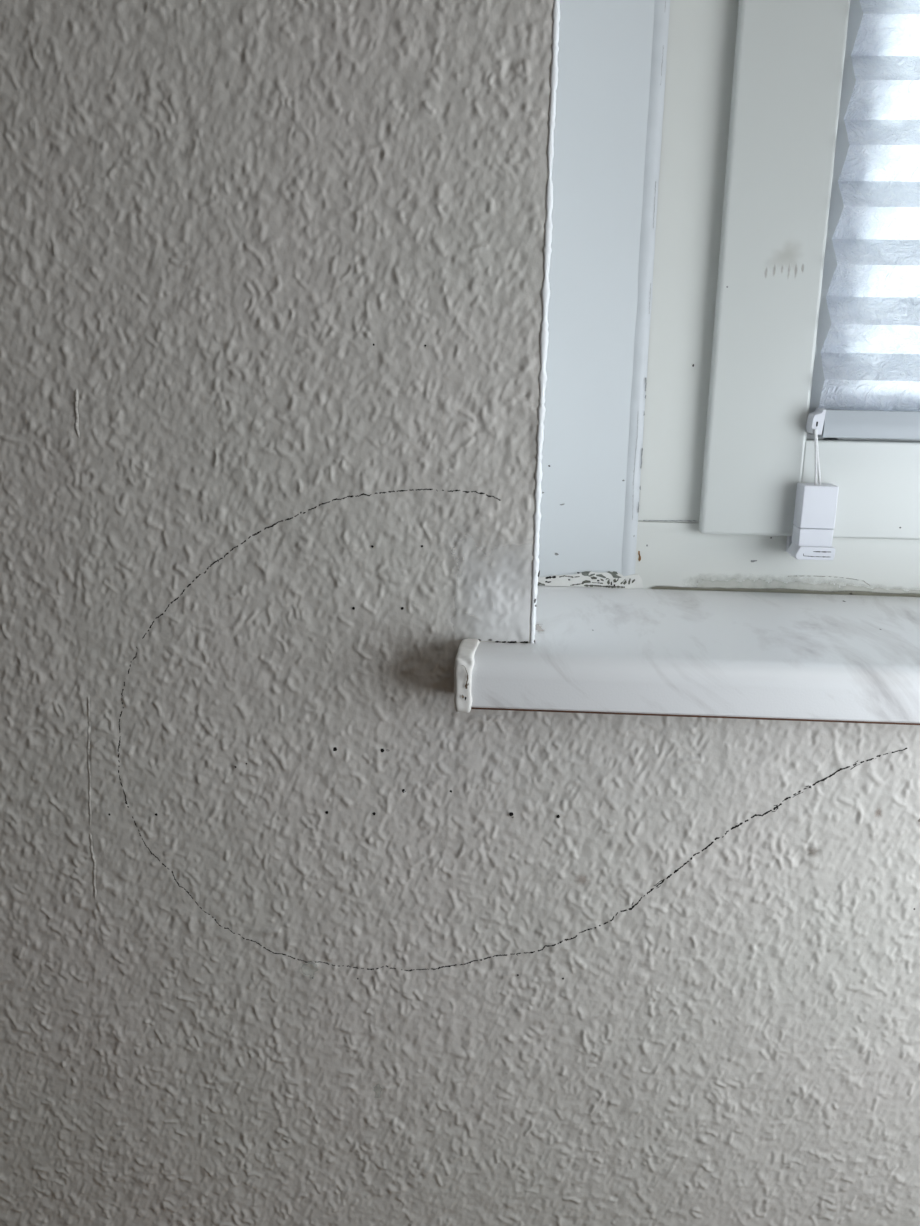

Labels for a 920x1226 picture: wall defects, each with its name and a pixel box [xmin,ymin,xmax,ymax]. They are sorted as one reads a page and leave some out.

crack [118,489,907,971]